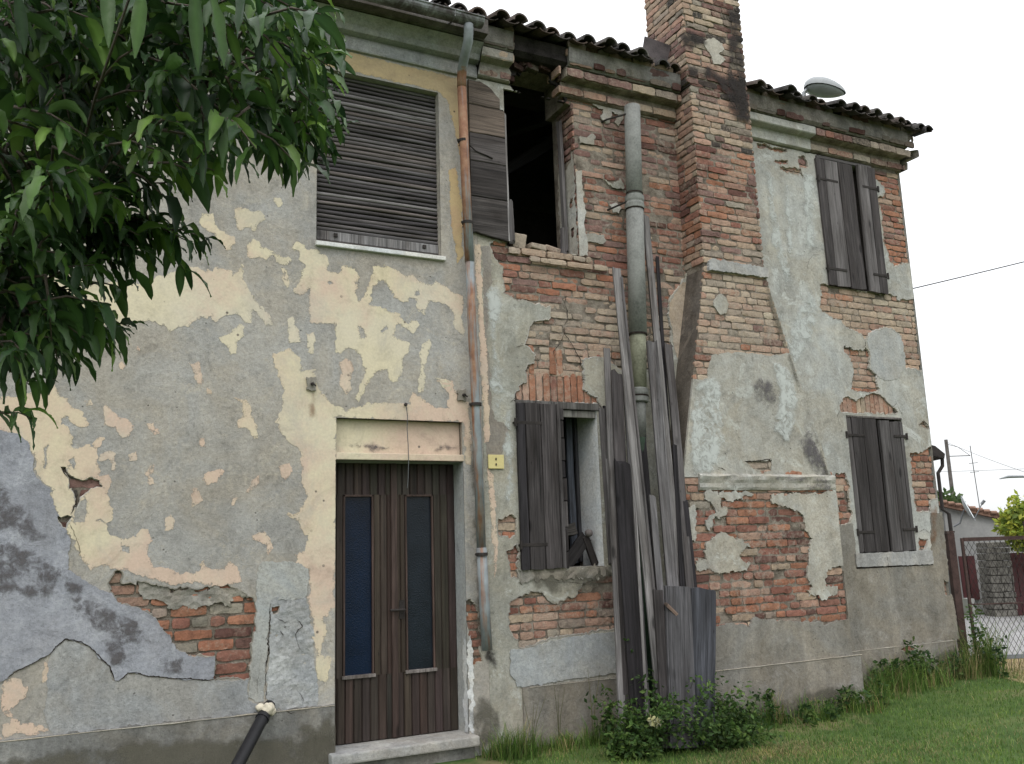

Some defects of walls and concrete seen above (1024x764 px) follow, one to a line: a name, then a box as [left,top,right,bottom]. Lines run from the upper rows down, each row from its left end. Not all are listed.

spalling [640,115,686,371]
spalling [48,52,630,683]
spalling [819,282,922,416]
water stain [0,493,39,539]
peeling [0,677,48,739]
water stain [0,545,141,665]
crack [9,638,210,681]
peeling [0,385,257,681]
crack [257,611,303,713]
spalling [685,472,853,626]
spalling [909,446,937,513]